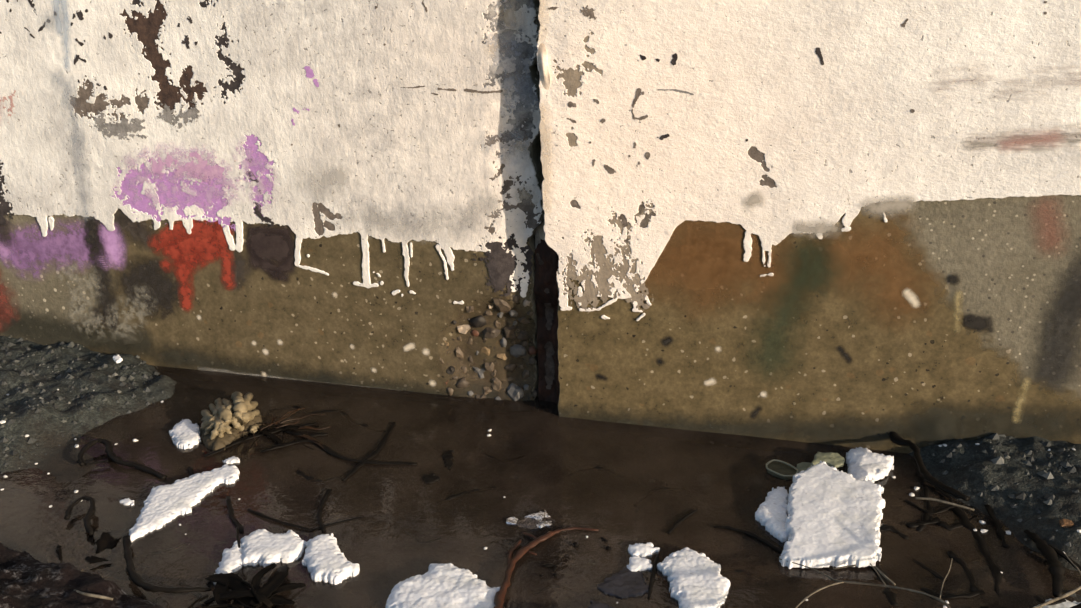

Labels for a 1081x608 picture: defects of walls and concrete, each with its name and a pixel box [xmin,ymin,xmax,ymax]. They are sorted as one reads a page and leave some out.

peeling [68,0,245,144]
rust [534,239,560,414]